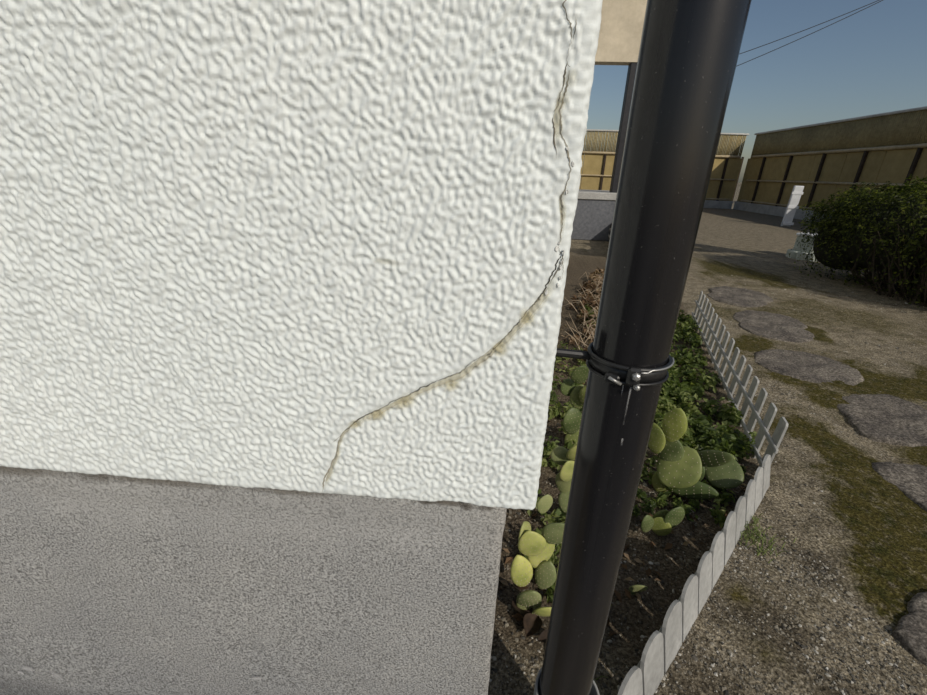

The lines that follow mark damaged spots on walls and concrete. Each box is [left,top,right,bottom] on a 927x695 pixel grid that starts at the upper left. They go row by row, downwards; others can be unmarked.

crack [322,0,577,488]